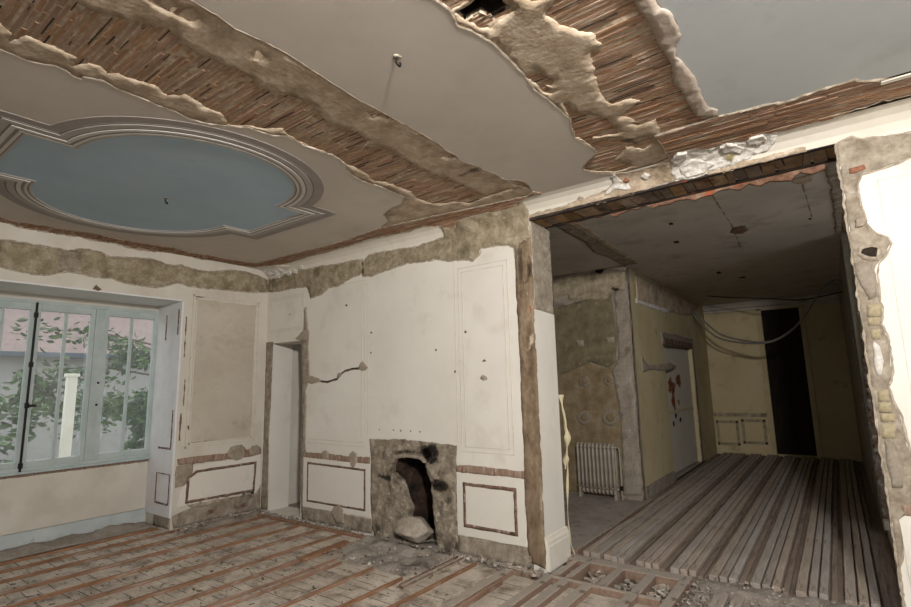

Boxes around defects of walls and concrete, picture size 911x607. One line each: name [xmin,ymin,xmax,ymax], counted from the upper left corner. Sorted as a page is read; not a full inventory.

flaking render [0,0,646,570]
crack [303,361,368,384]
flaking render [435,0,911,218]
flaking render [824,131,911,607]